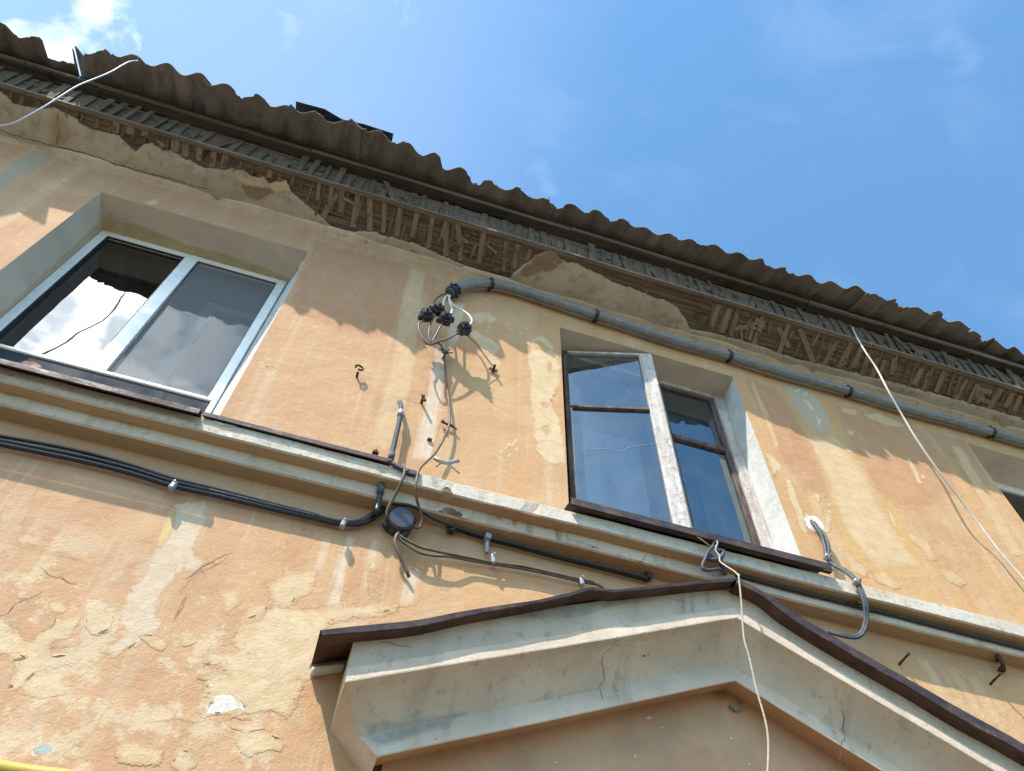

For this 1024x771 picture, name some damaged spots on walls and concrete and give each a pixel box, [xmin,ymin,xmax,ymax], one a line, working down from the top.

flaking render [0,88,52,108]
flaking render [64,108,565,278]
peeling [527,335,567,464]
peeling [0,499,213,699]
crack [174,552,232,618]
peeling [198,568,400,757]
peeling [28,742,58,757]
peeling [114,739,197,771]